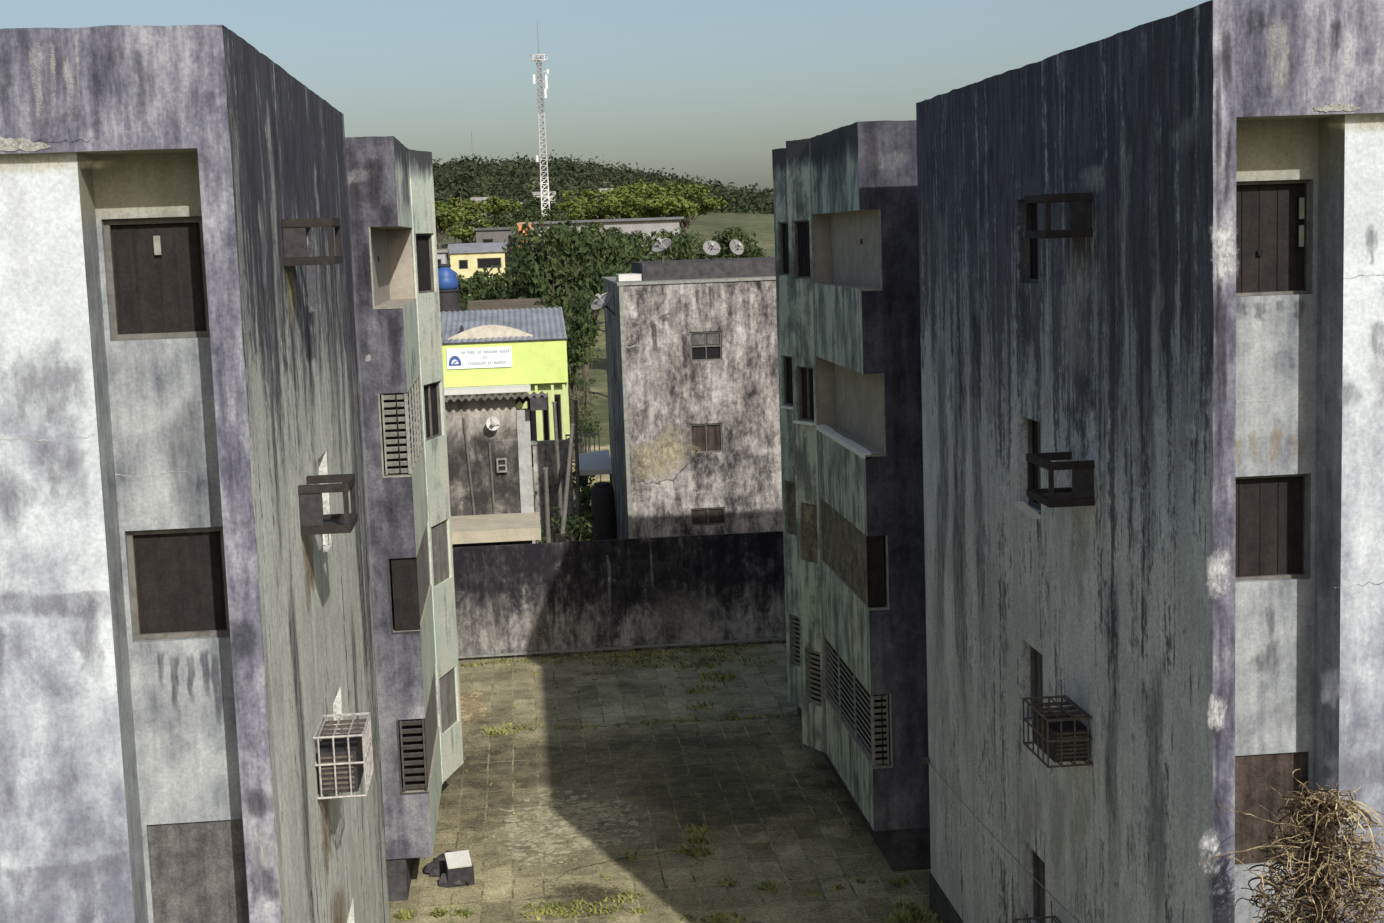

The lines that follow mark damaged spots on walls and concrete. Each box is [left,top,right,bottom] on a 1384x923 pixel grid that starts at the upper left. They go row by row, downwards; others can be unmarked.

spalling [0,136,51,152]
damp [1217,112,1231,184]
damp [22,368,77,418]
damp [234,109,376,733]
damp [937,297,984,620]
damp [158,654,222,712]
damp [290,613,313,902]
rust [322,799,331,863]